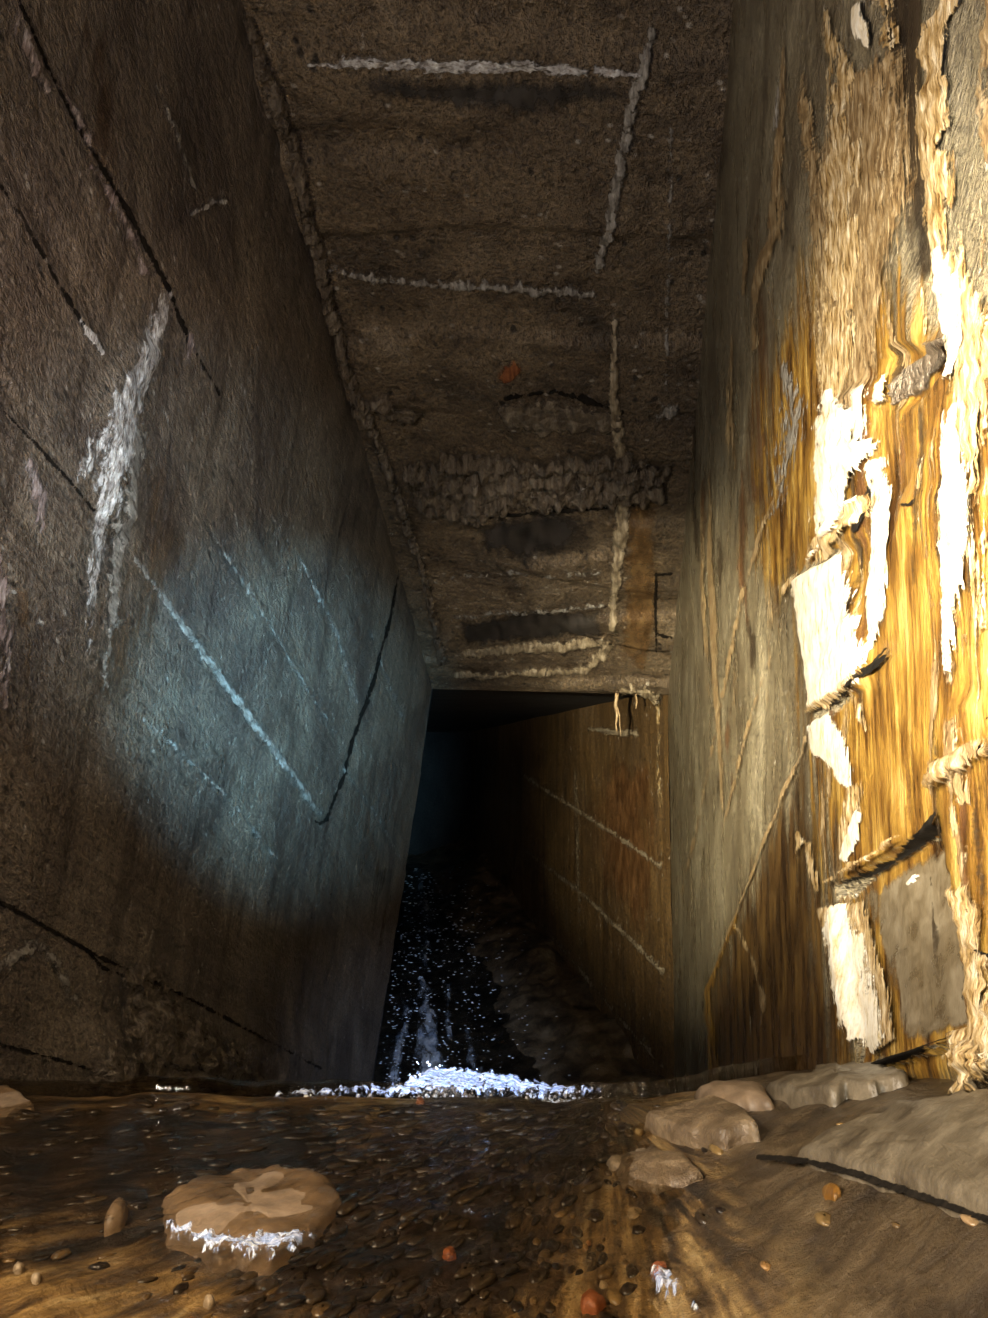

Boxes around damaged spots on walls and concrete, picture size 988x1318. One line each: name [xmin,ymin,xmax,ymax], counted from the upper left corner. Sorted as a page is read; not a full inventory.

damp [369,76,616,112]
crack [0,0,220,396]
spalling [886,337,945,405]
damp [76,290,173,697]
crack [315,570,399,825]
damp [463,611,599,644]
damp [481,515,592,561]
spalling [781,479,875,862]
spalling [815,852,967,1054]